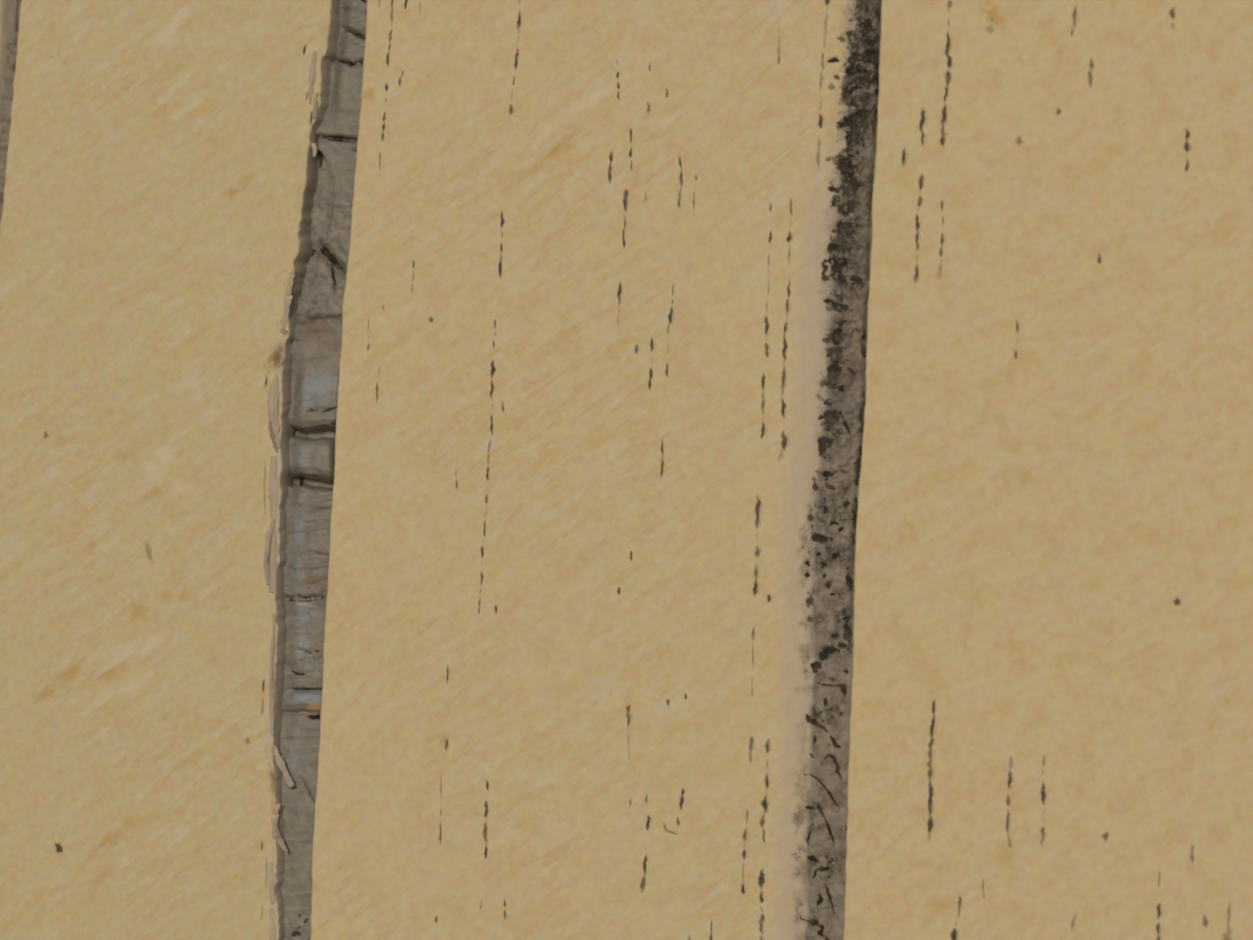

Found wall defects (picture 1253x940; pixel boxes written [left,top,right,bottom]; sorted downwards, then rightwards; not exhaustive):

peeling [303,45,319,157]
peeling [261,269,295,593]
leakage [793,0,881,940]
peeling [261,613,295,853]